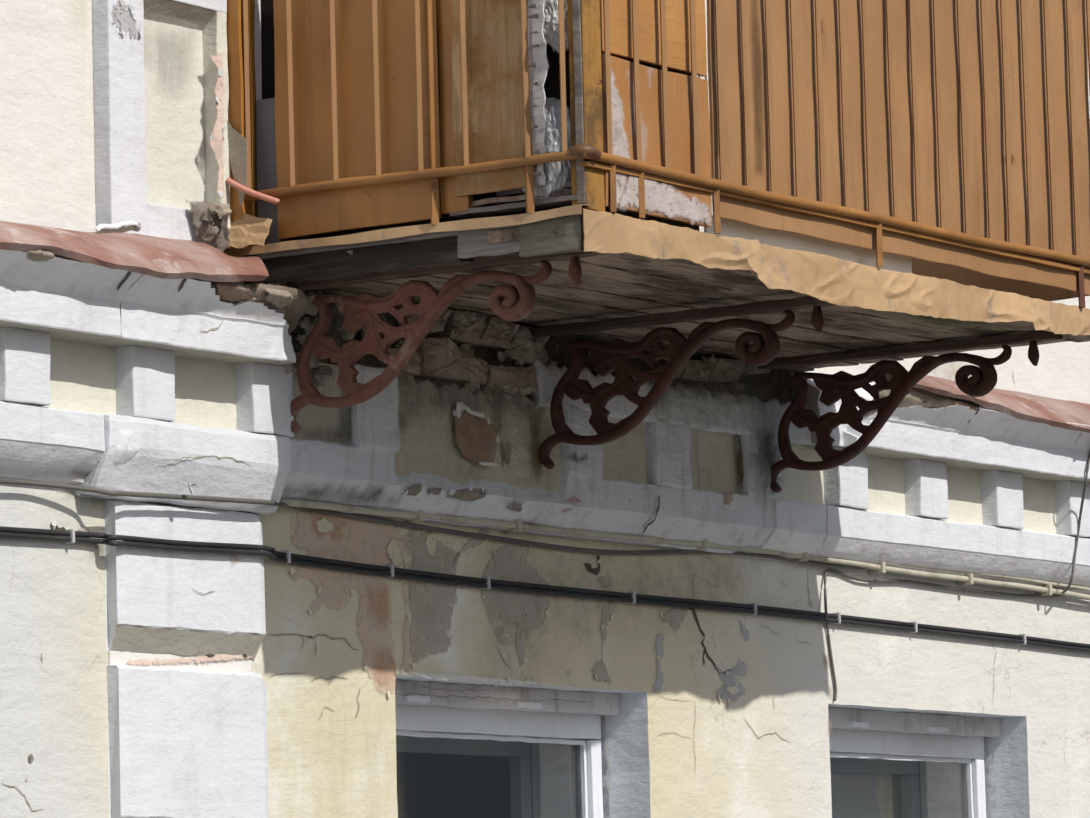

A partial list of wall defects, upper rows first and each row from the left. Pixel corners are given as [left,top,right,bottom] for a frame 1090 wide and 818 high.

peeling [109,0,146,39]
spalling [208,281,334,388]
flaking render [394,308,562,502]
spalling [674,354,770,395]
spalling [506,502,527,512]
crack [642,495,660,534]
crack [268,633,360,721]
peeling [290,511,538,698]
peeling [482,544,550,666]
peeling [652,607,687,693]
crack [661,574,733,674]